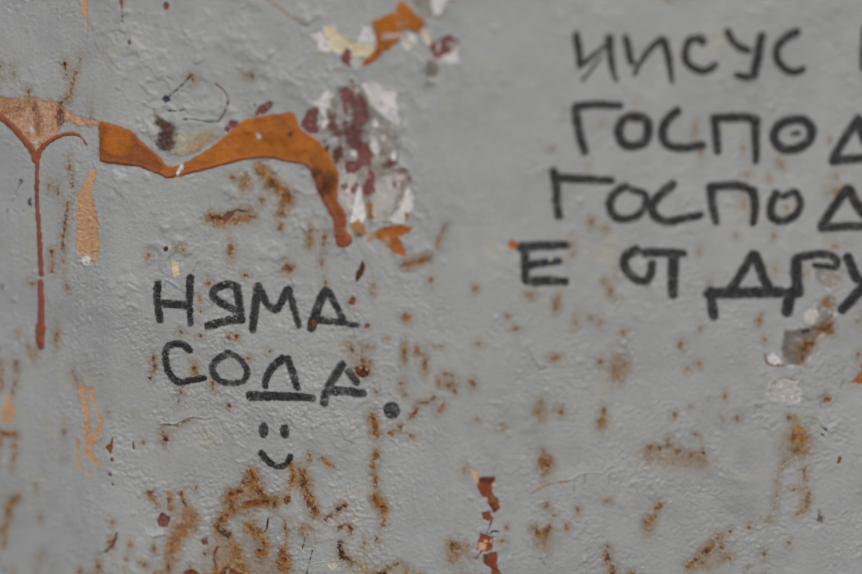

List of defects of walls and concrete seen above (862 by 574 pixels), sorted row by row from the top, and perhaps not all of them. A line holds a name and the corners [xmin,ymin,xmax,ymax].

peeling [253,101,273,116]
peeling [301,0,460,257]
peeling [163,246,185,276]
peeling [755,269,840,409]
corrosion [142,449,421,574]
corrosion [447,540,469,564]